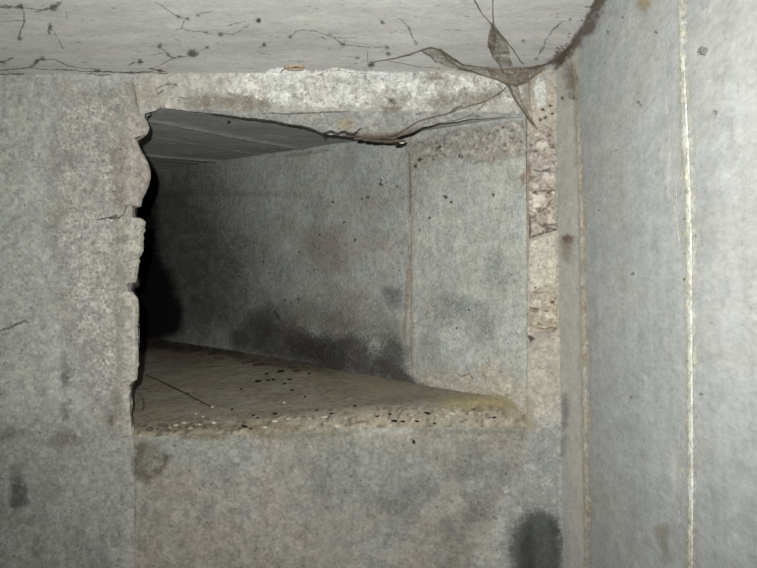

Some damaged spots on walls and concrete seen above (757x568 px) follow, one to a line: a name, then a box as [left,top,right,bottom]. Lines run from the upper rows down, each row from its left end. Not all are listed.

crack [0,2,248,103]
crack [539,0,605,96]
peeling [50,81,151,438]
damp [229,306,416,384]
damp [511,512,562,568]